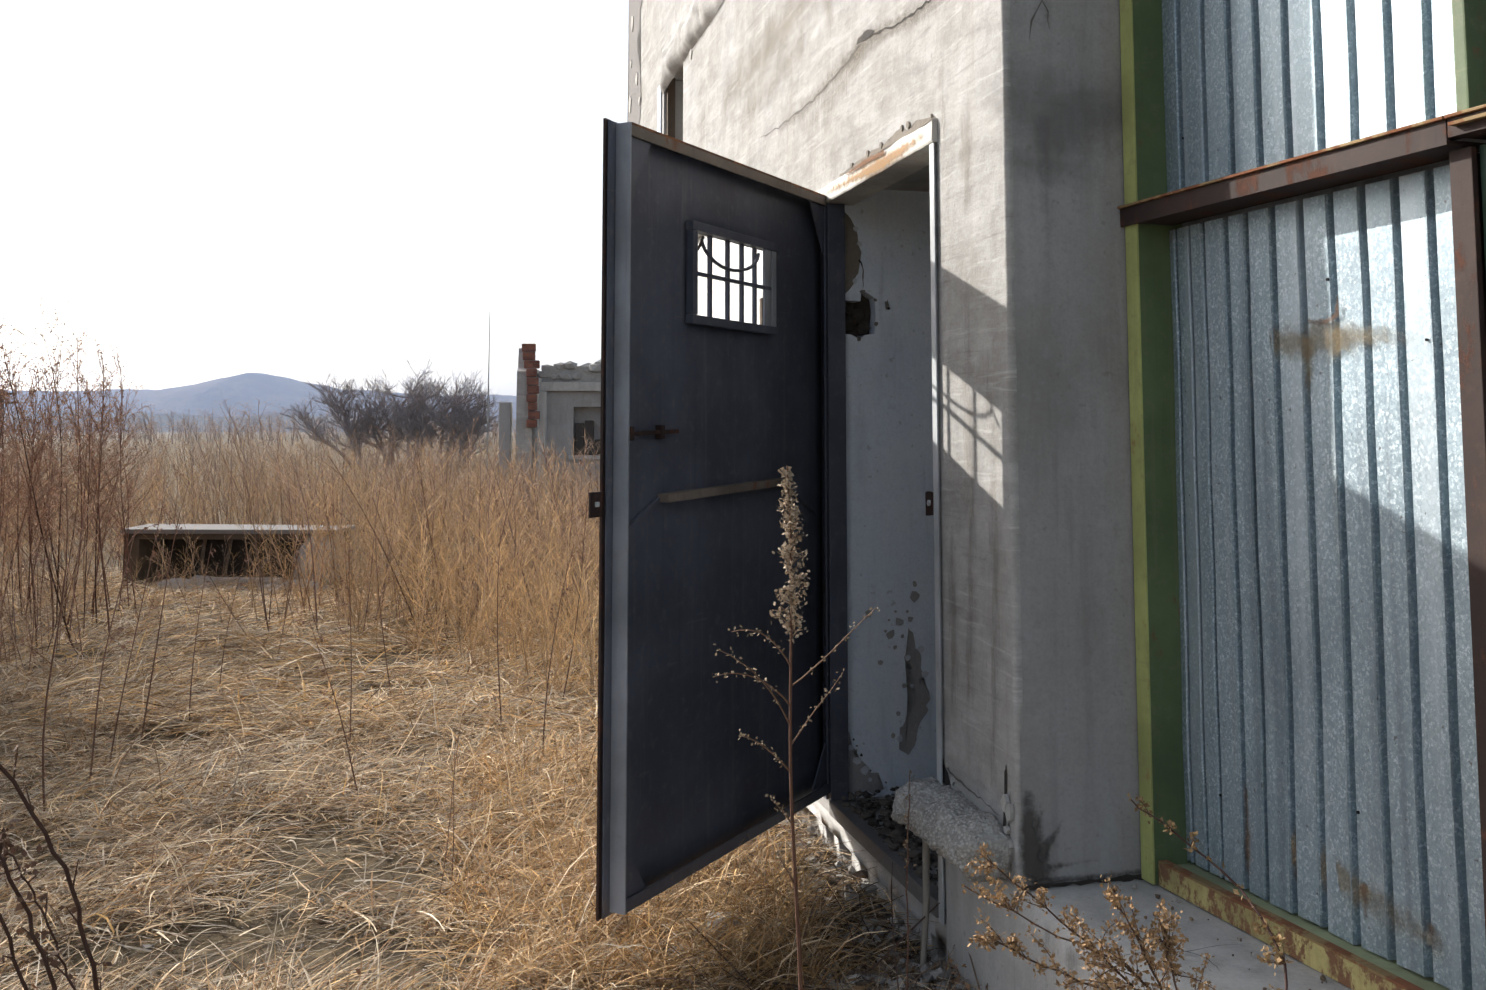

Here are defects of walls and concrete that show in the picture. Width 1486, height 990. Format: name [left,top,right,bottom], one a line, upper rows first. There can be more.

crack [1029,0,1050,39]
crack [759,0,931,139]
spalling [839,114,934,176]
corrosion [1308,300,1338,324]
peeling [865,581,930,755]